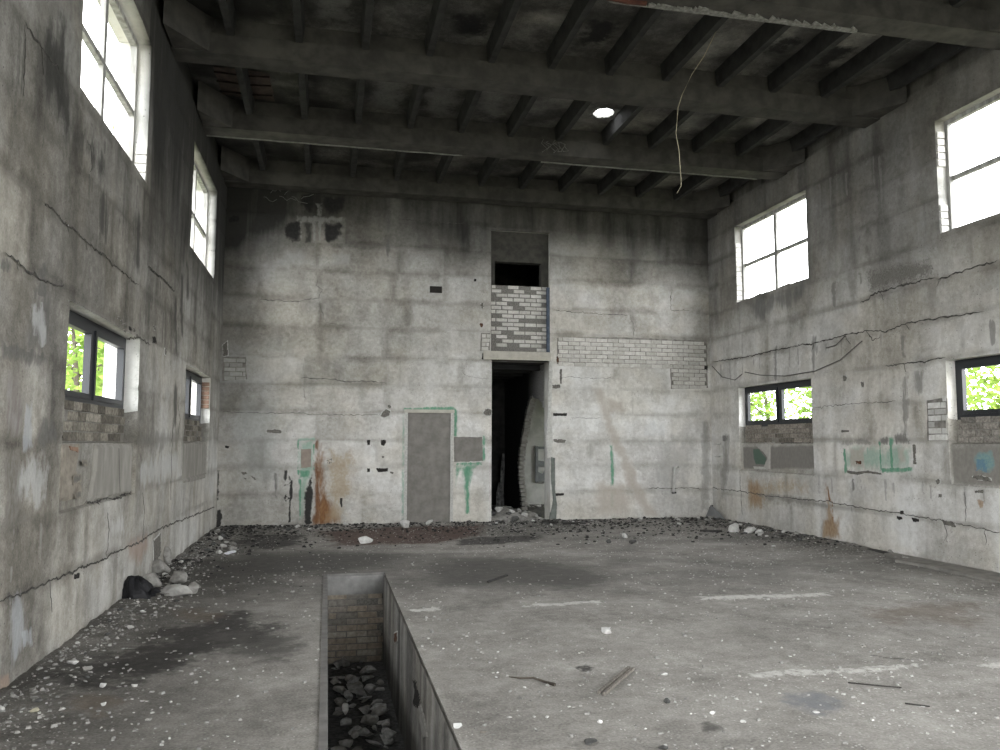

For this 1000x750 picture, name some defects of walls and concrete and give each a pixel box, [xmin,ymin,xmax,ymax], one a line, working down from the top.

crack [5,252,64,287]
crack [45,203,175,292]
crack [860,261,996,303]
crack [715,312,979,362]
crack [886,357,944,372]
crack [0,472,214,609]
rust [310,430,492,547]
crack [648,487,999,545]
rust [820,480,844,541]